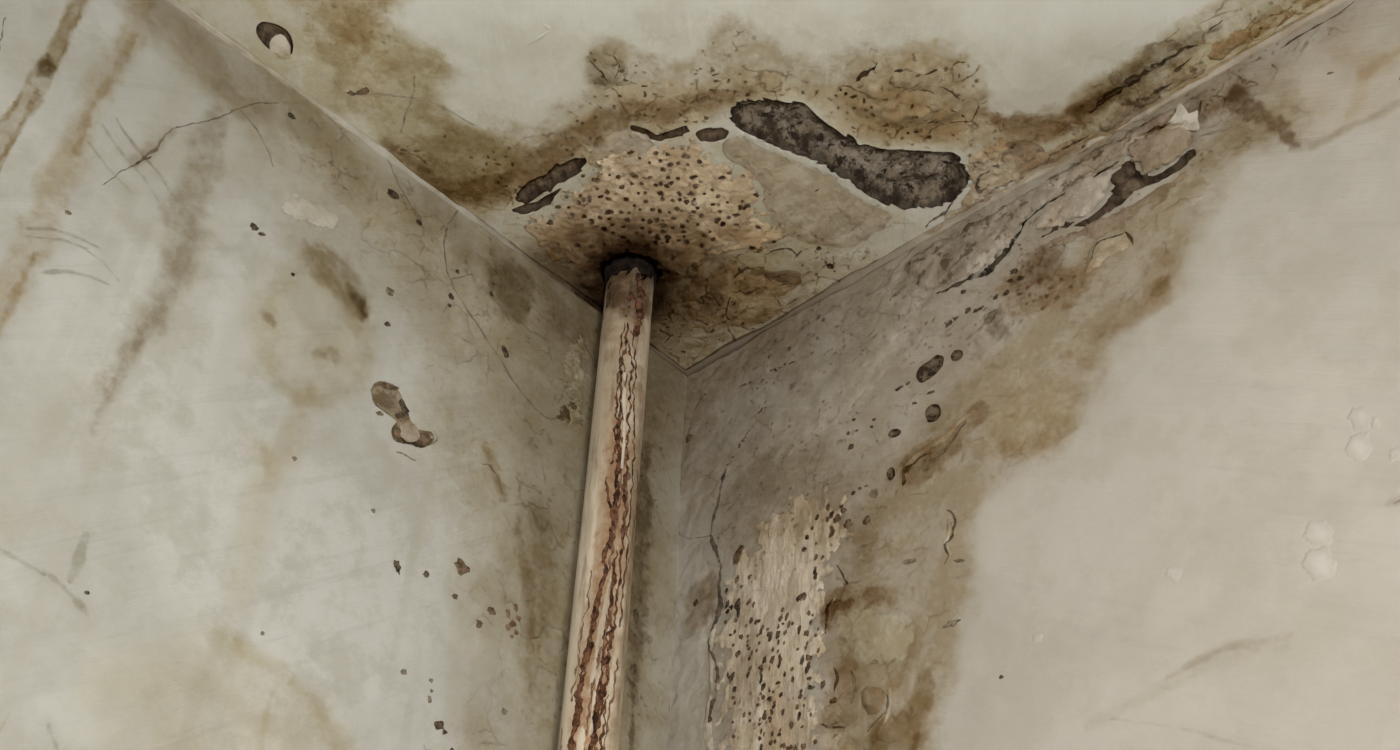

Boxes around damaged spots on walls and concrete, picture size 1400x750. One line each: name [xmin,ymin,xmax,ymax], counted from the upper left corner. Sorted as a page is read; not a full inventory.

spalling [256,22,293,60]
leakage [581,239,697,369]
peeling [371,381,438,461]
crack [679,400,767,750]